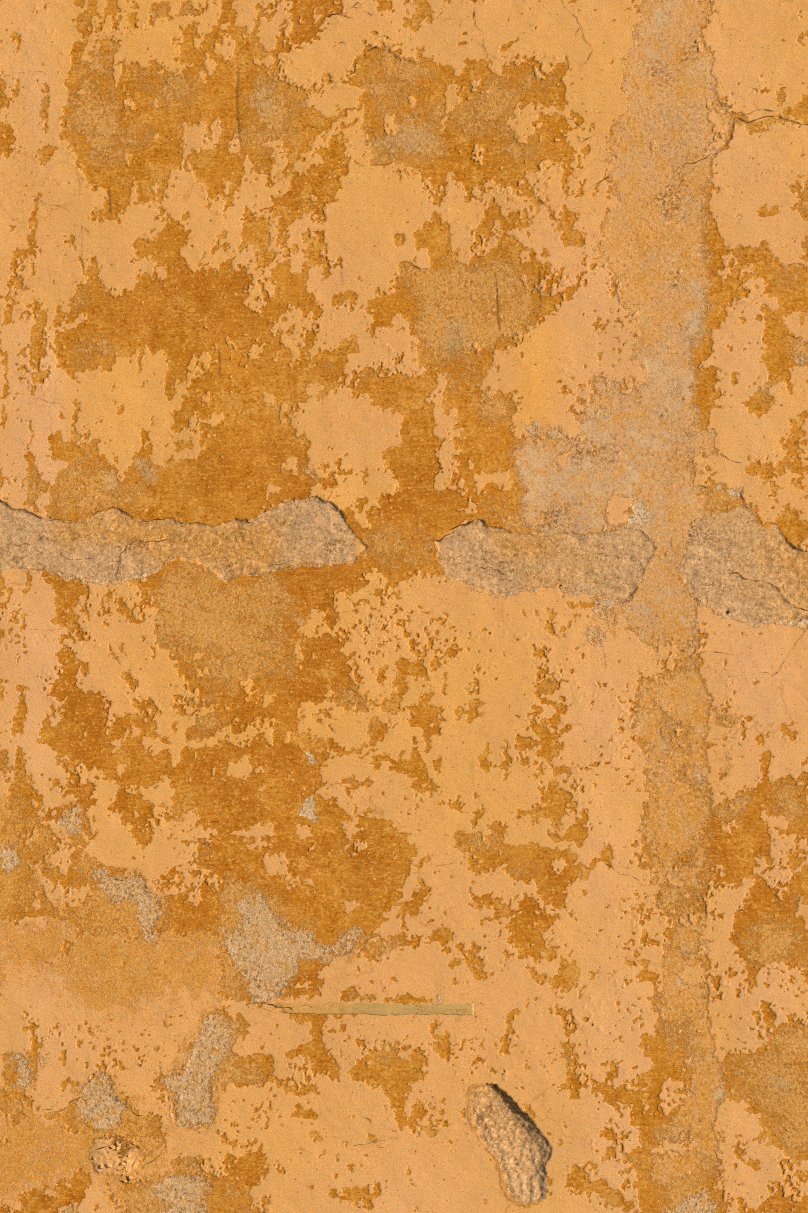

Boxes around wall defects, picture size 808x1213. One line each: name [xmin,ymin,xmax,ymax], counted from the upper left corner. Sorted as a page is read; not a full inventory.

peeling [373,0,450,32]
peeling [0,71,23,159]
crack [685,95,808,165]
peeling [389,233,406,247]
peeling [121,672,138,694]
peeling [9,685,29,742]
peeling [335,774,373,798]
peeling [340,982,442,1007]
peeling [74,1019,113,1050]
peeling [494,997,537,1070]
peeling [470,1055,505,1075]
spalling [460,1079,563,1209]